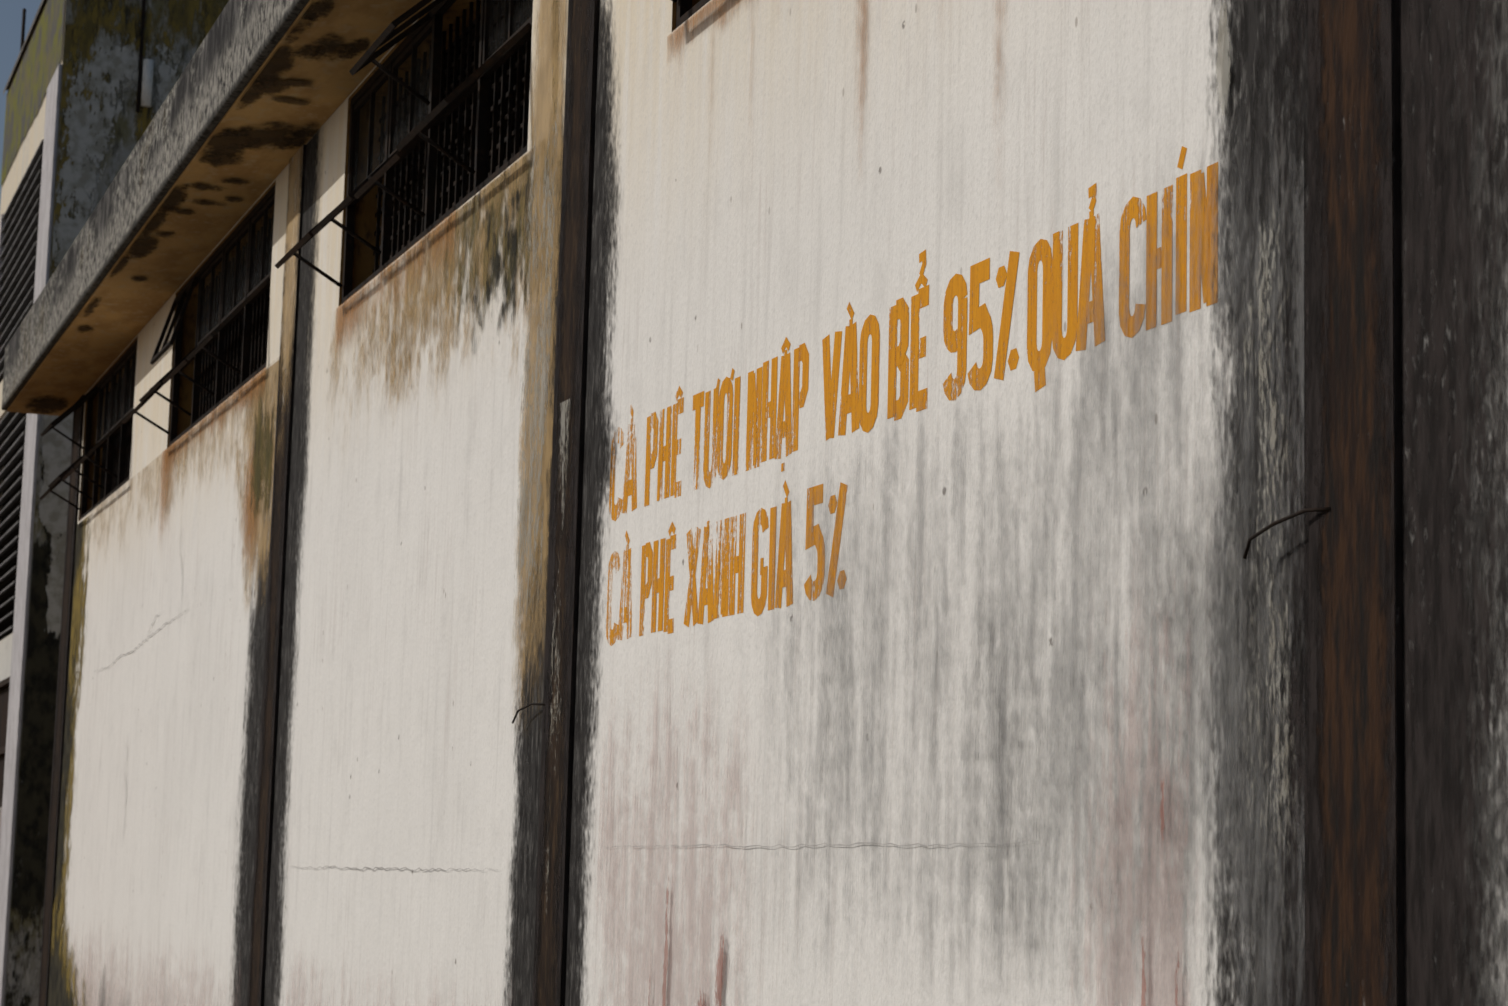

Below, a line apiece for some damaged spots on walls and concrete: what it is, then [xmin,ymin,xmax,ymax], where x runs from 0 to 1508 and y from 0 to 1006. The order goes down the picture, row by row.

leakage [5,395,108,1006]
leakage [78,298,100,333]
leakage [110,122,320,1006]
leakage [240,0,369,109]
leakage [373,0,618,1006]
rust [671,0,727,42]
leakage [1210,0,1508,1006]